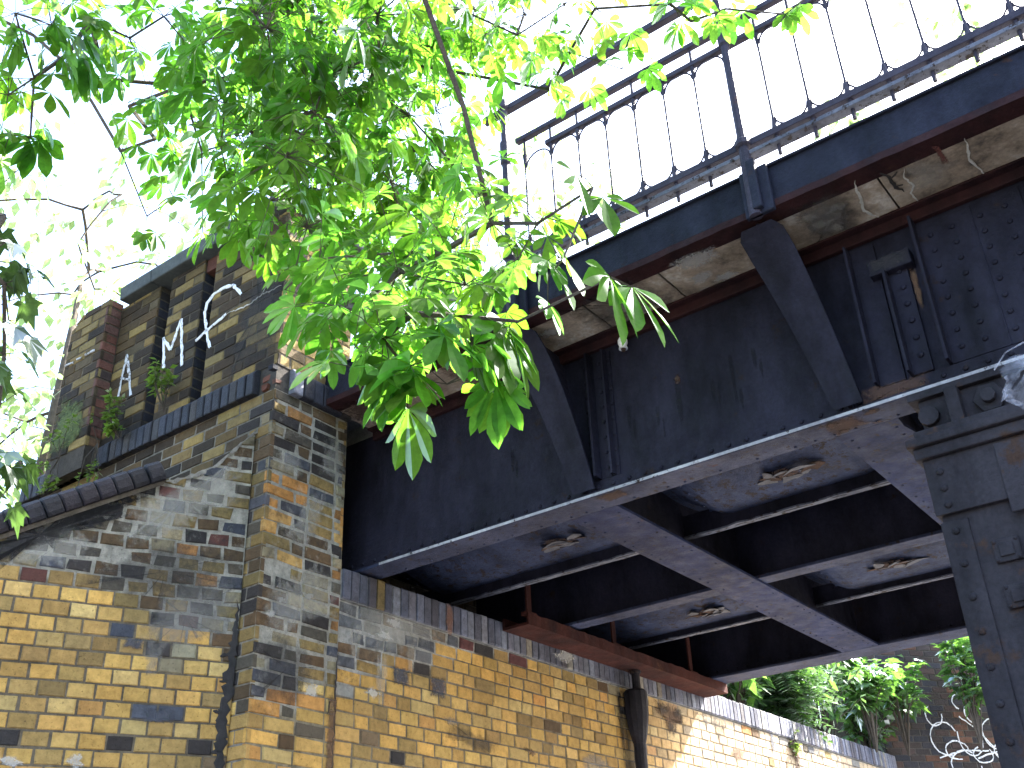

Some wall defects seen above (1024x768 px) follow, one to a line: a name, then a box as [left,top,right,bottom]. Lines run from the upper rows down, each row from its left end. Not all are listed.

crack [964,138,984,174]
crack [854,183,879,217]
crack [880,170,918,201]